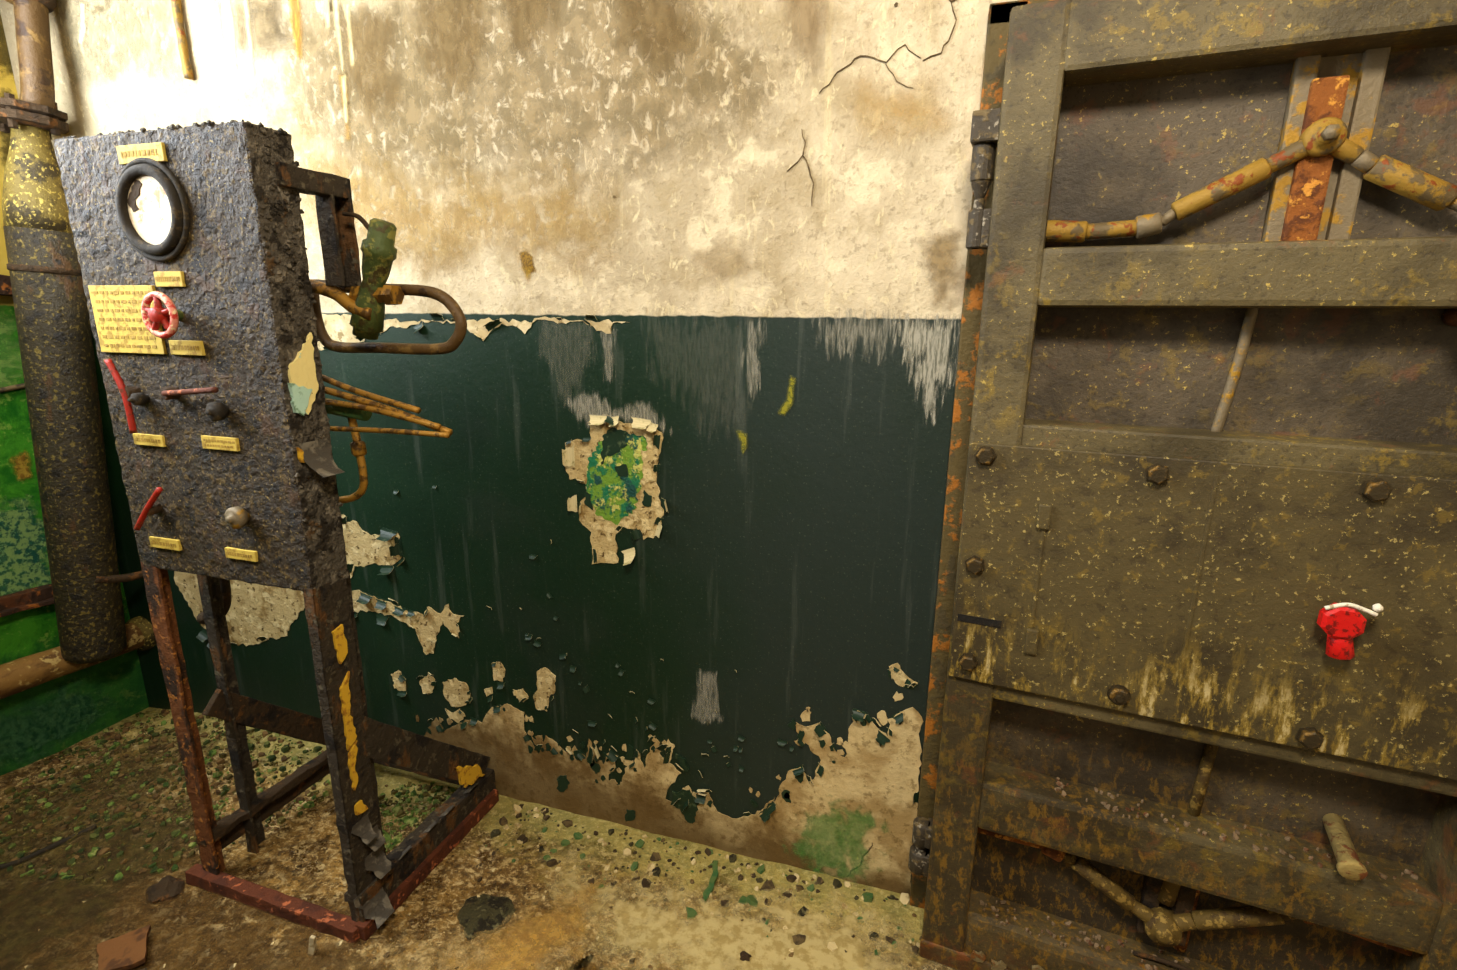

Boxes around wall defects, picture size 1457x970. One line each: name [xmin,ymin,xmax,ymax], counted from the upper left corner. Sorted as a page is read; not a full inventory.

water stain [56,0,173,80]
water stain [788,0,824,46]
crack [819,0,957,93]
water stain [127,180,142,212]
water stain [236,0,768,258]
crack [787,129,814,206]
peeling [96,119,624,367]
water stain [894,238,960,424]
peeling [562,413,668,566]
peeling [174,571,209,648]
peeling [225,580,305,646]
peeling [295,472,923,903]